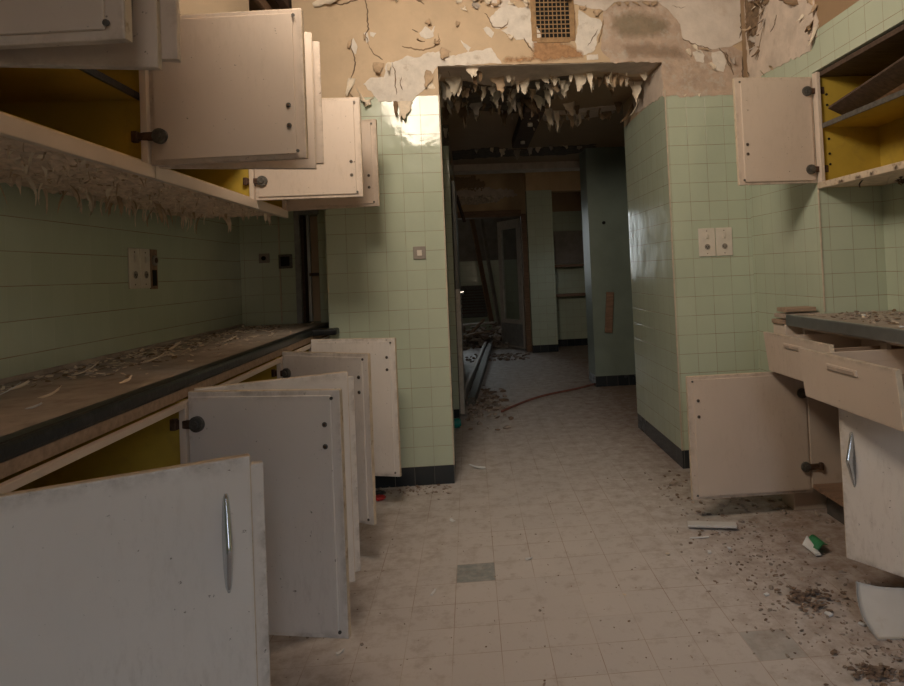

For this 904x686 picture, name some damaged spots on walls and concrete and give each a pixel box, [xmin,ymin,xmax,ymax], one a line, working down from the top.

flaking render [344,0,819,160]